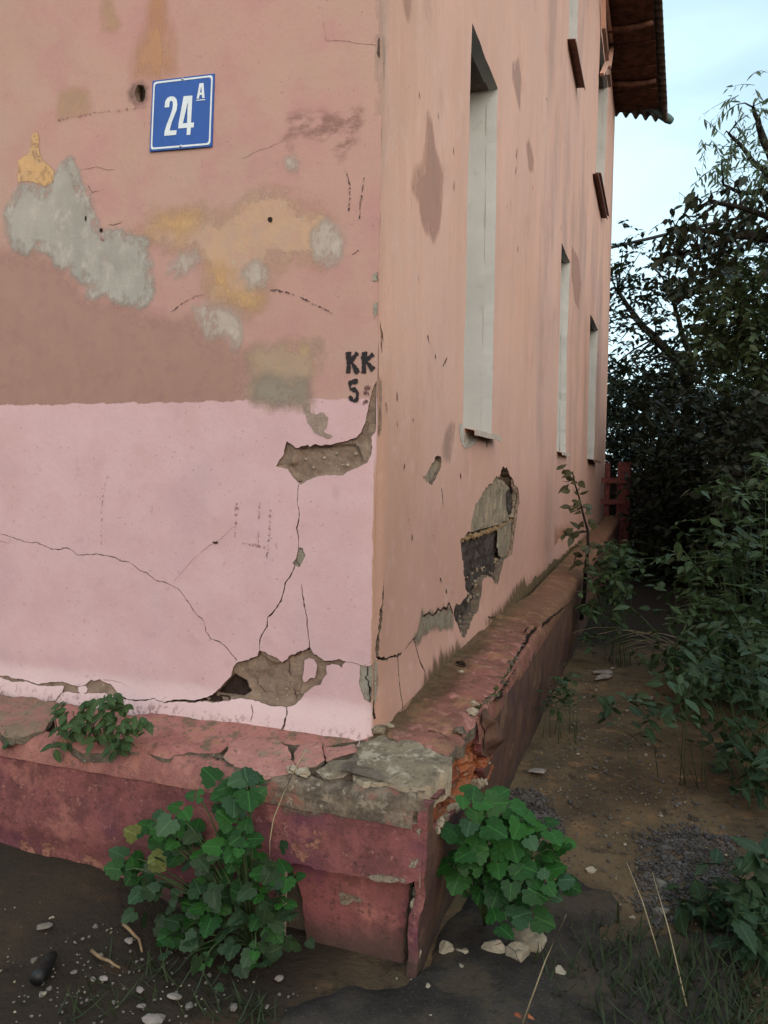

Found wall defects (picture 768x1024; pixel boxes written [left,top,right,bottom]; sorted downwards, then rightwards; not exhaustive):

damp [413,120,442,238]
peeling [3,131,342,347]
flaking render [277,377,382,484]
flaking render [425,460,439,483]
crack [1,527,237,660]
crack [261,580,310,652]
flaking render [415,471,519,645]
crack [138,692,253,720]
flaking render [206,648,346,706]
spalling [433,739,494,834]